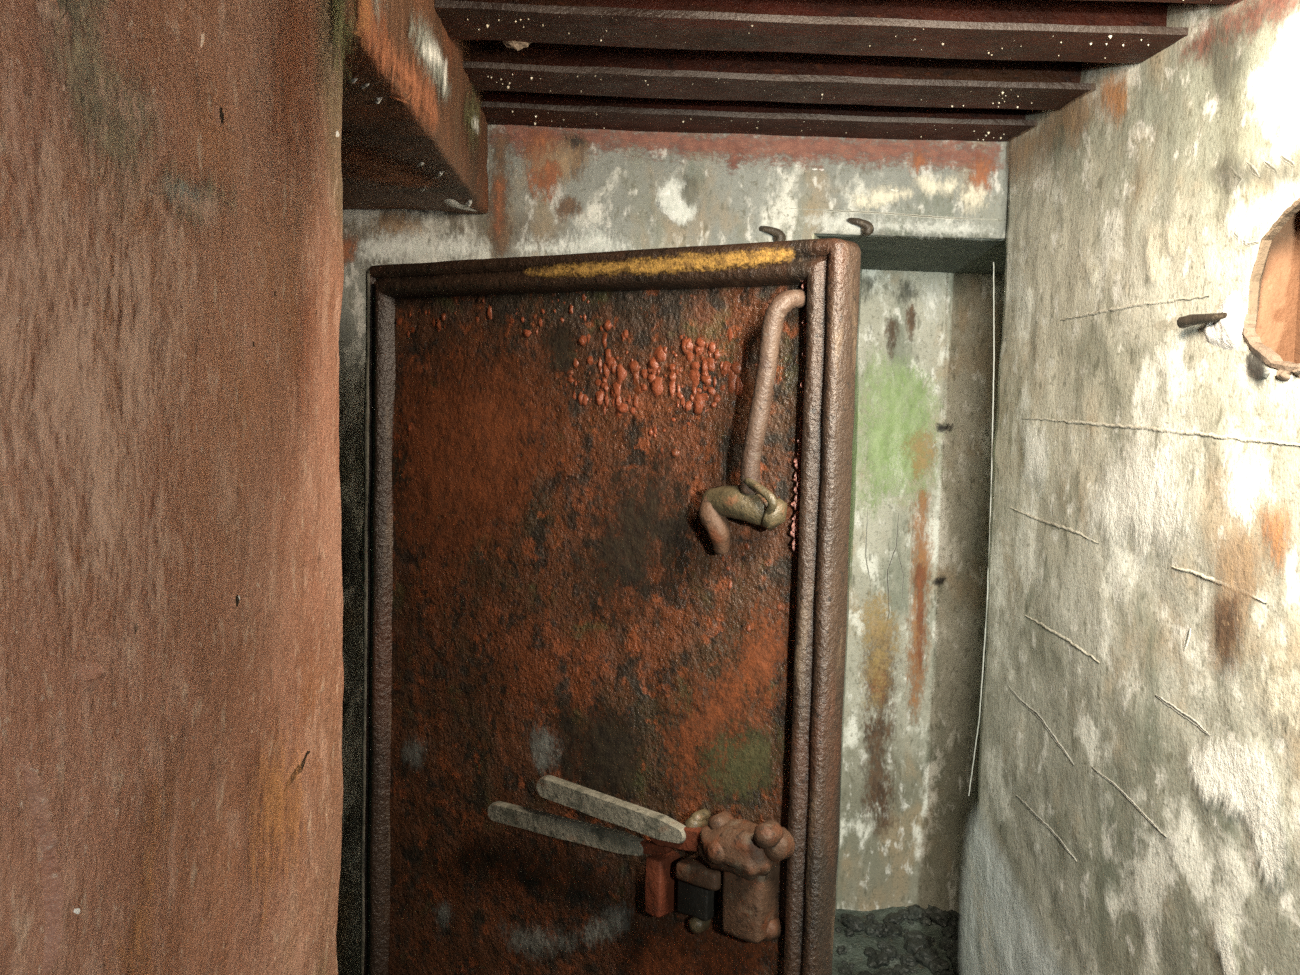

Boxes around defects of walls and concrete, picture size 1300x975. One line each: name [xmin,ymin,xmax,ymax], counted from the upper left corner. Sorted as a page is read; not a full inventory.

corrosion [488,75,1127,257]
water stain [898,282,941,321]
spalling [1228,198,1300,381]
water stain [968,262,995,796]
corrosion [663,600,791,797]
corrosion [861,491,930,833]